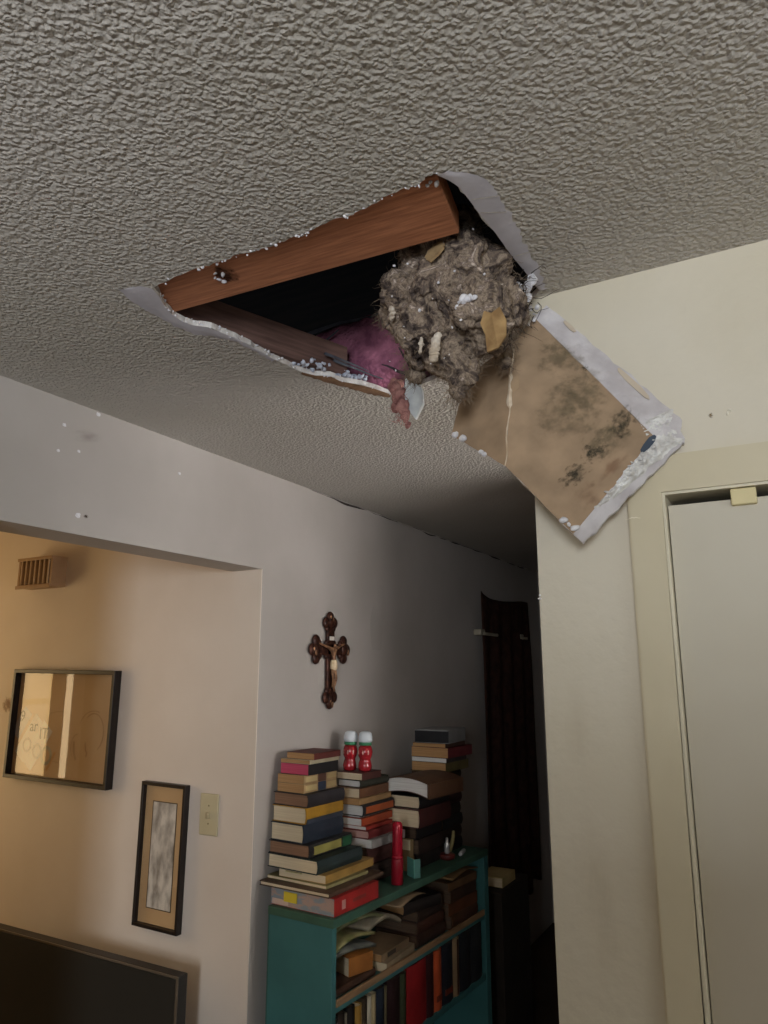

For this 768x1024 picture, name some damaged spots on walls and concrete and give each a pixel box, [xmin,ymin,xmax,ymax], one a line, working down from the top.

flaking render [448,289,478,329]
mould [567,445,603,484]
flaking render [559,517,580,531]